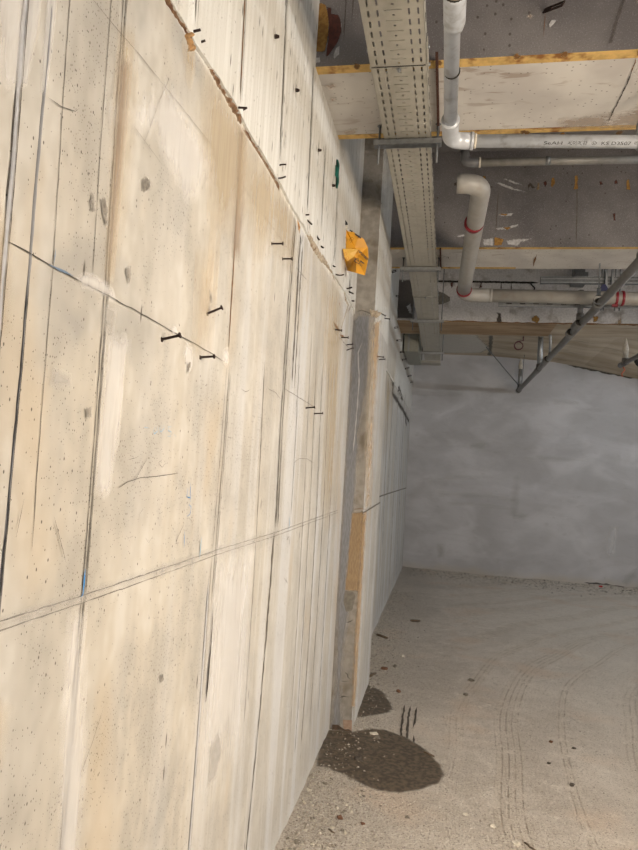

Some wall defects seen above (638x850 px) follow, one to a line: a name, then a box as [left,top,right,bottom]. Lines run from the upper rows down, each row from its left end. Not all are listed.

crack [608,60,636,122]